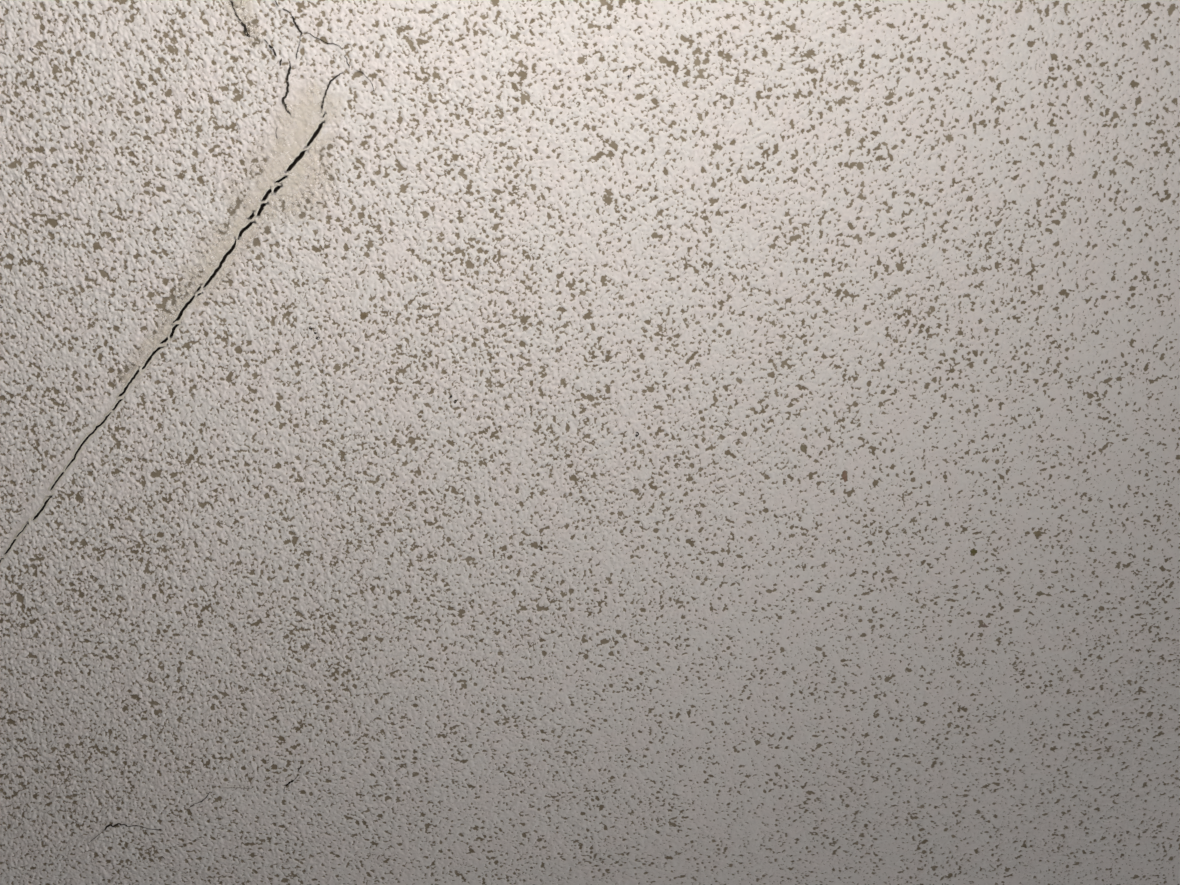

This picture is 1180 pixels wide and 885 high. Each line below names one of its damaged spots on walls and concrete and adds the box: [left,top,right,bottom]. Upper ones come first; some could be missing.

crack [0,0,375,565]